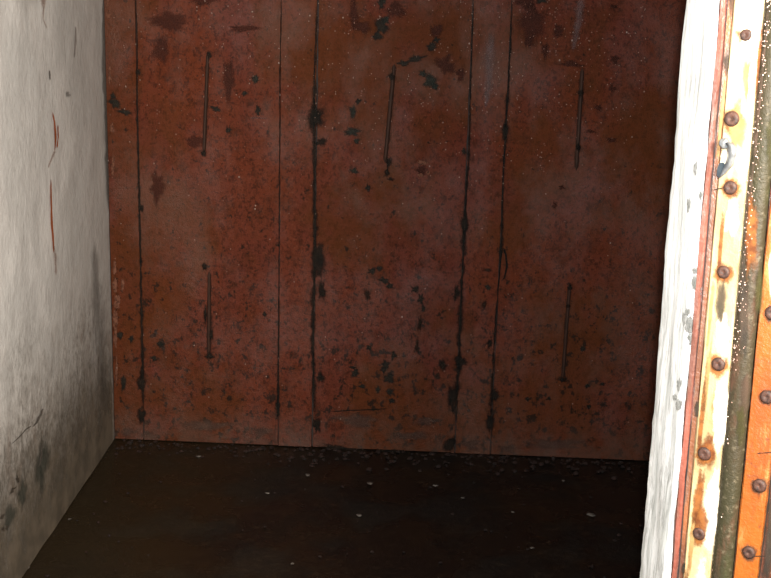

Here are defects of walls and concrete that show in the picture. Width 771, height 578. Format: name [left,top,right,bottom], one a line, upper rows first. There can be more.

water stain [0,381,131,578]
corrosion [136,4,146,423]
corrosion [307,14,327,432]
corrosion [440,20,473,416]
corrosion [486,279,499,432]
corrosion [499,18,512,266]
corrosion [678,0,742,578]